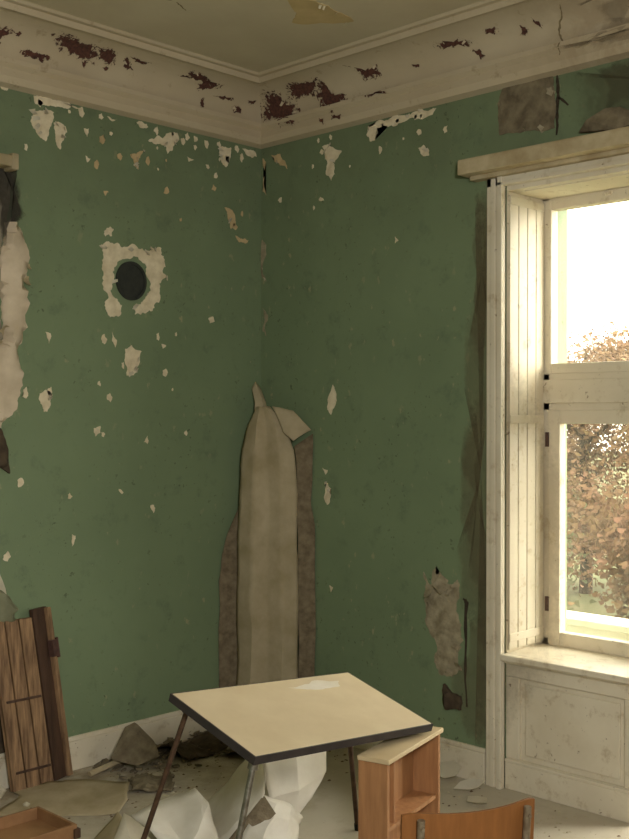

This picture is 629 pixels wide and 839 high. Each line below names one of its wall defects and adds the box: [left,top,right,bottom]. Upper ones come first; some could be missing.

peeling [20,49,51,63]
peeling [52,33,149,71]
peeling [343,64,382,81]
peeling [434,38,484,59]
peeling [180,70,348,128]
peeling [29,96,85,149]
peeling [366,108,436,154]
peeling [117,121,287,194]
peeling [317,135,342,179]
peeling [99,227,168,317]
peeling [101,333,142,377]
peeling [39,387,53,412]